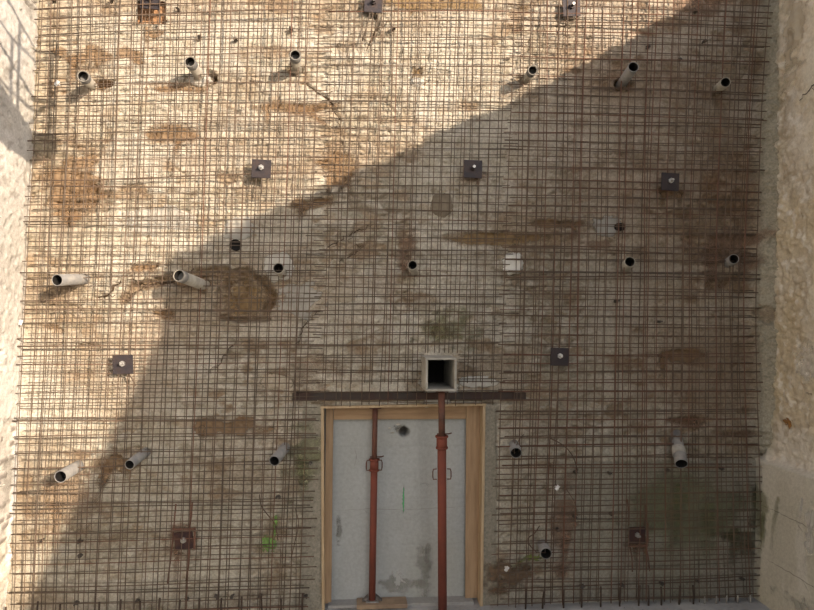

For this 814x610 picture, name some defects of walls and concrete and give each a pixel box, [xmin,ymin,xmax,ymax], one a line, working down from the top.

rust [46,154,104,227]